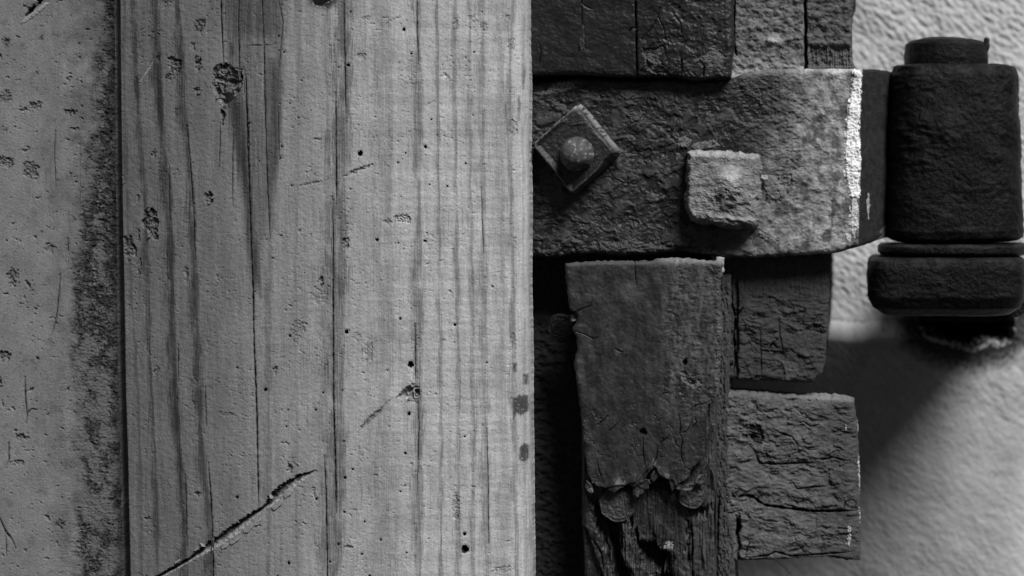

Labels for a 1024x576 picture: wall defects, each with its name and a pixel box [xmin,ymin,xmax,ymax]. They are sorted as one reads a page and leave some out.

peeling [565,232,724,498]
crack [184,463,215,576]
crack [690,421,858,576]